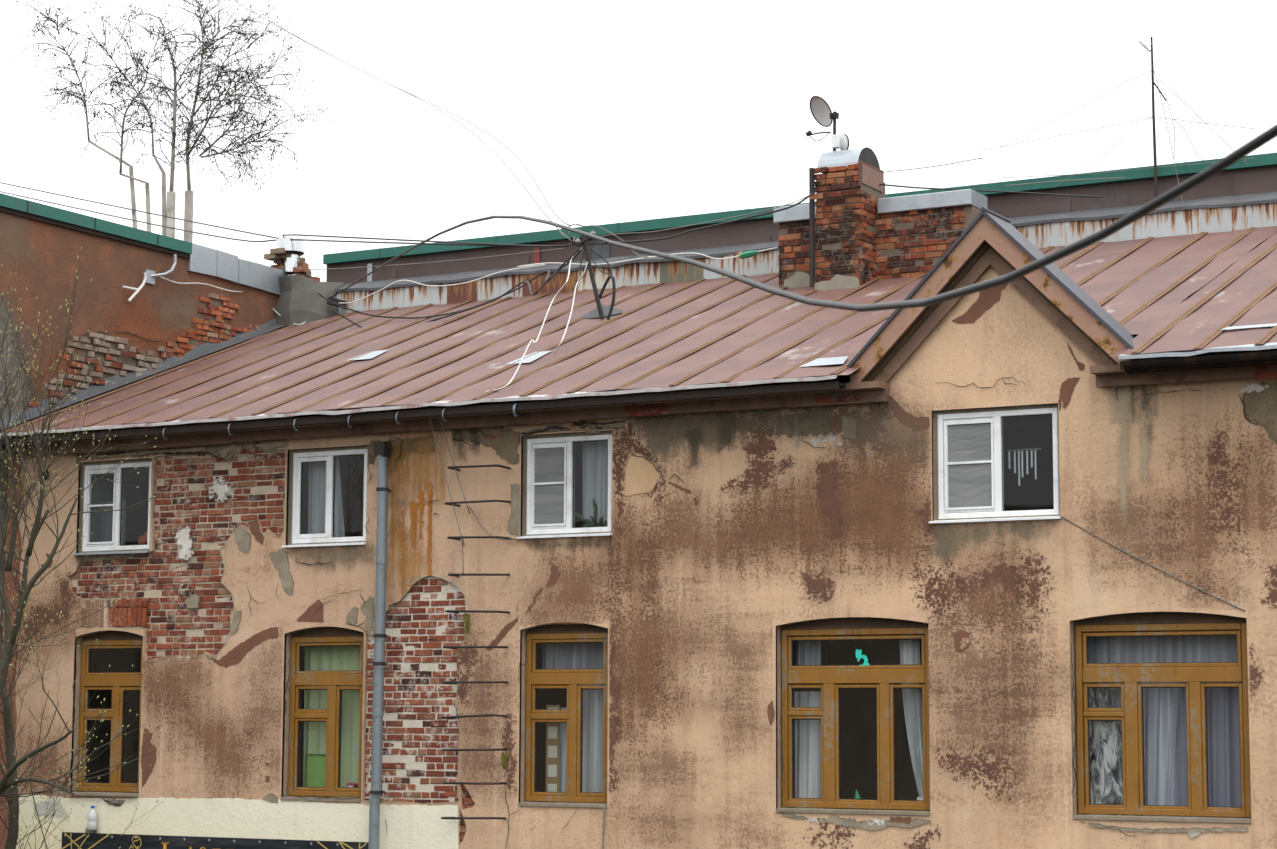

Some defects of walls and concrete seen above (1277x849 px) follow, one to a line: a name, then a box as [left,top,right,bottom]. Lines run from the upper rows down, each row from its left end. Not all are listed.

spalling [23,291,260,411]
rust [387,431,443,597]
leakage [636,407,829,464]
spalling [18,443,287,799]
peeling [362,396,1054,842]
peeling [803,817,941,849]